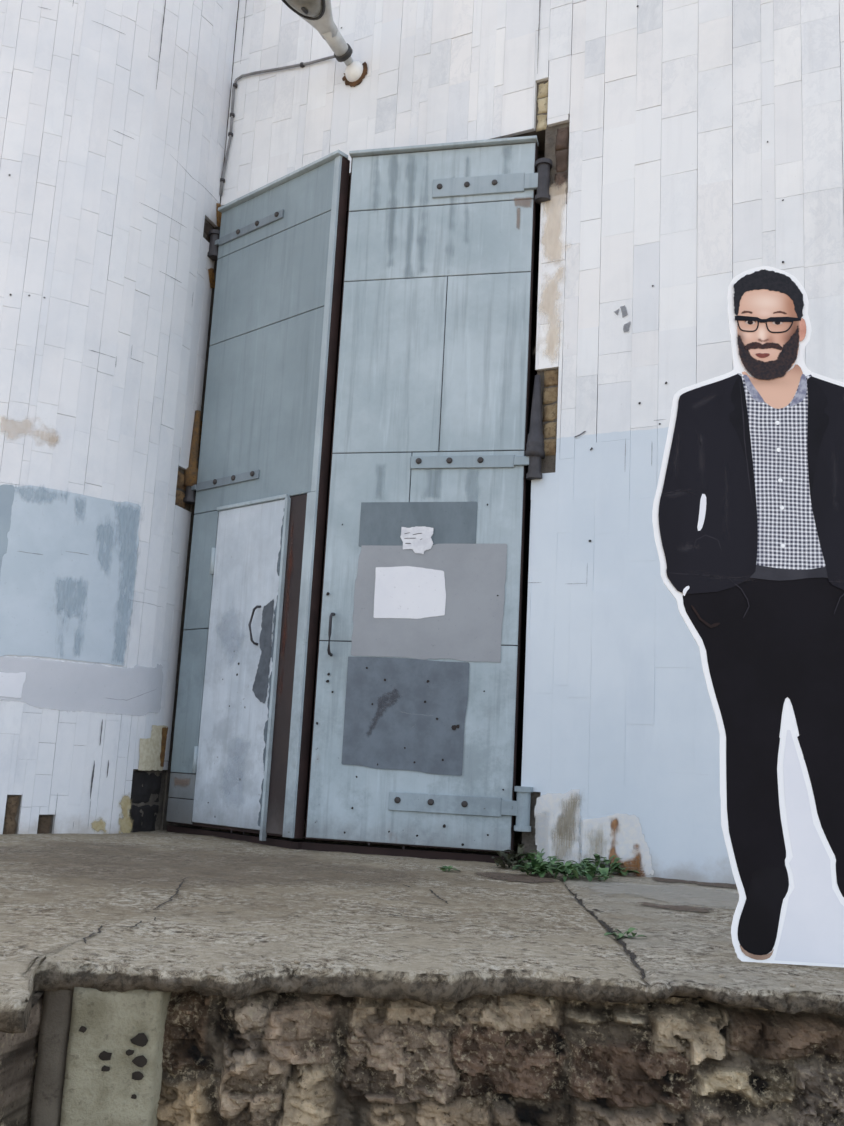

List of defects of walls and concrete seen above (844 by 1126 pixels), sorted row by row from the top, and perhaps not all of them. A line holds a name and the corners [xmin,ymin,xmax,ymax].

spalling [536,81,569,192]
spalling [542,369,559,456]
spalling [129,725,168,832]
spalling [3,796,20,834]
spalling [37,816,52,834]
leakage [553,797,578,862]
rust [609,819,645,877]
crack [83,878,185,944]
crack [565,885,650,985]